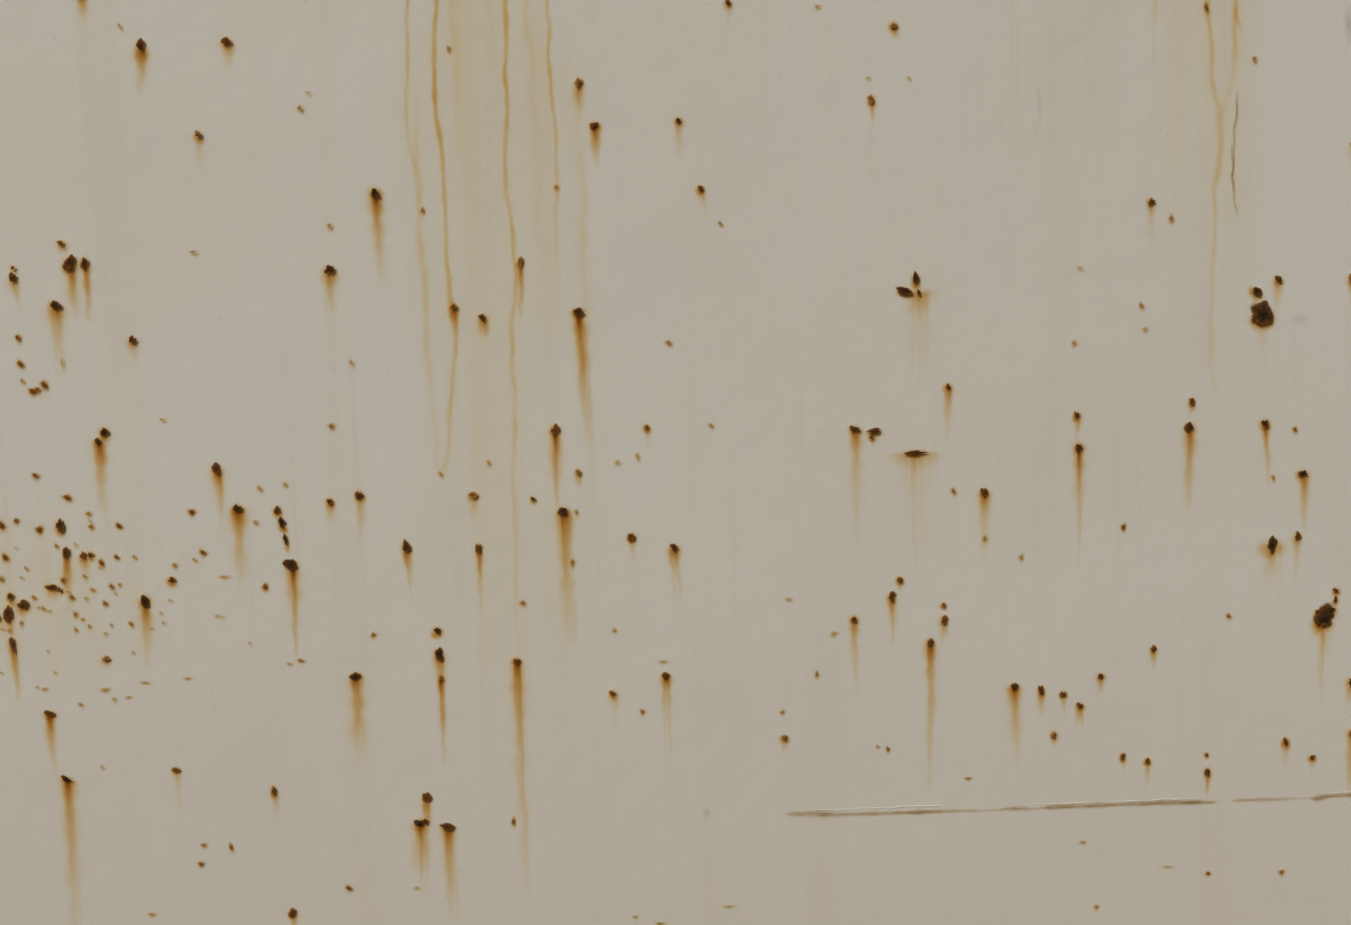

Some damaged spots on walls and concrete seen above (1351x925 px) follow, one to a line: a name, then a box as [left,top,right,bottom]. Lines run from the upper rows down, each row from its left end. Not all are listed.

corrosion [896,271,920,295]
corrosion [1250,287,1273,326]
corrosion [850,426,880,439]
corrosion [36,519,135,565]
corrosion [0,577,76,653]
corrosion [1313,588,1338,627]
crack [1025,797,1196,805]
corrosion [414,819,454,831]